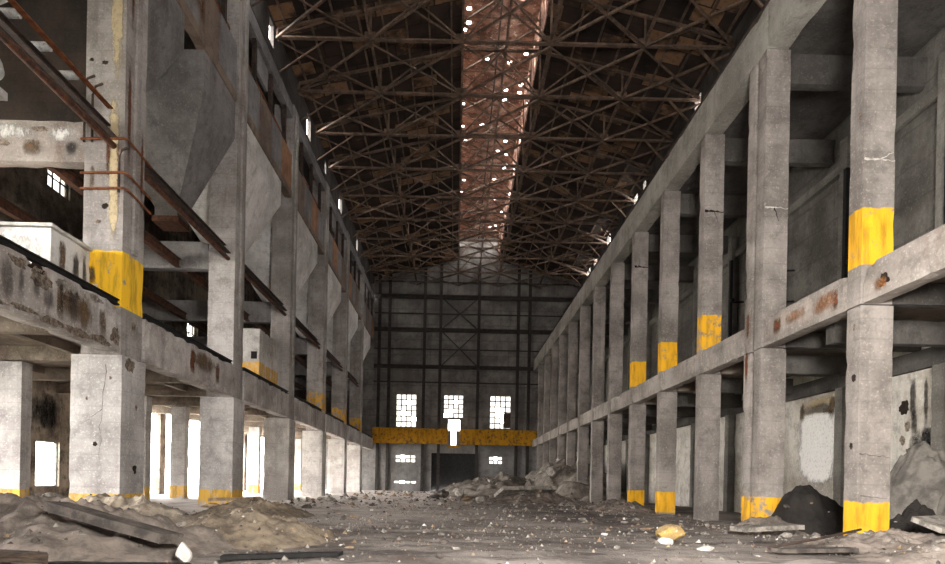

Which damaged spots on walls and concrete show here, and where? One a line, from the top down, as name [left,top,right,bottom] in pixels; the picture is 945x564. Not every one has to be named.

rust [774,310,803,333]
rust [816,292,837,312]
water stain [910,381,928,430]
peeling [799,401,835,483]